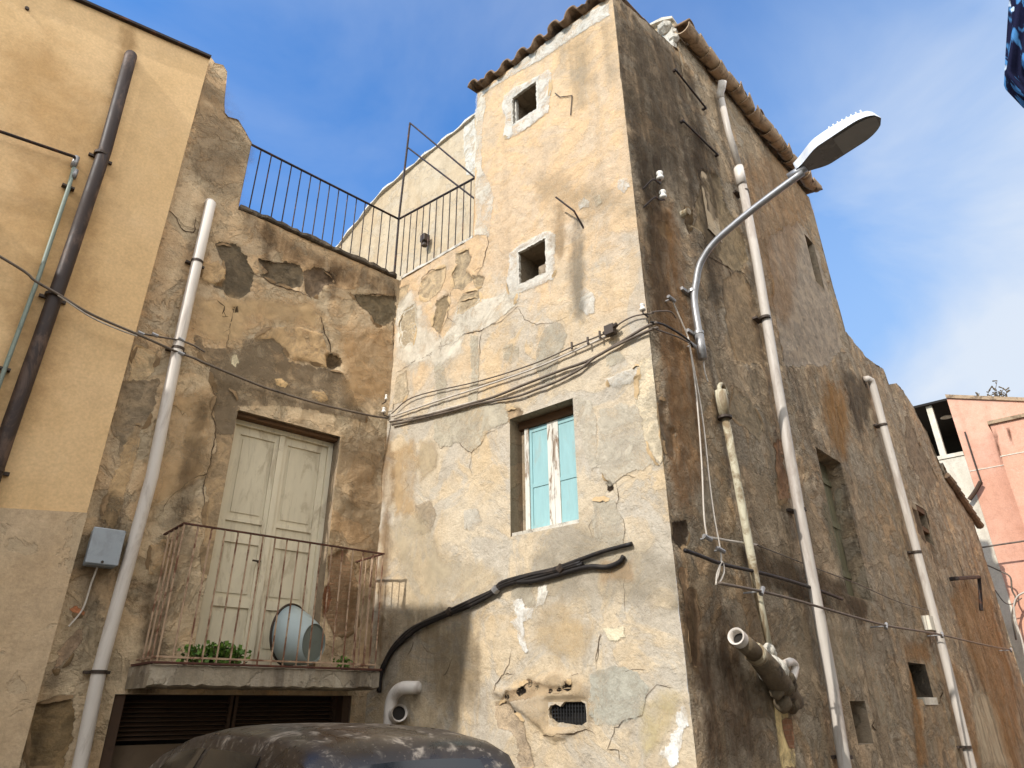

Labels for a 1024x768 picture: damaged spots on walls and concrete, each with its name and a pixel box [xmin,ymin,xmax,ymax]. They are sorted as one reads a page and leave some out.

flaking render [349,248,484,365]
crack [163,387,216,509]
flaking render [194,242,368,576]
crack [543,669,671,752]